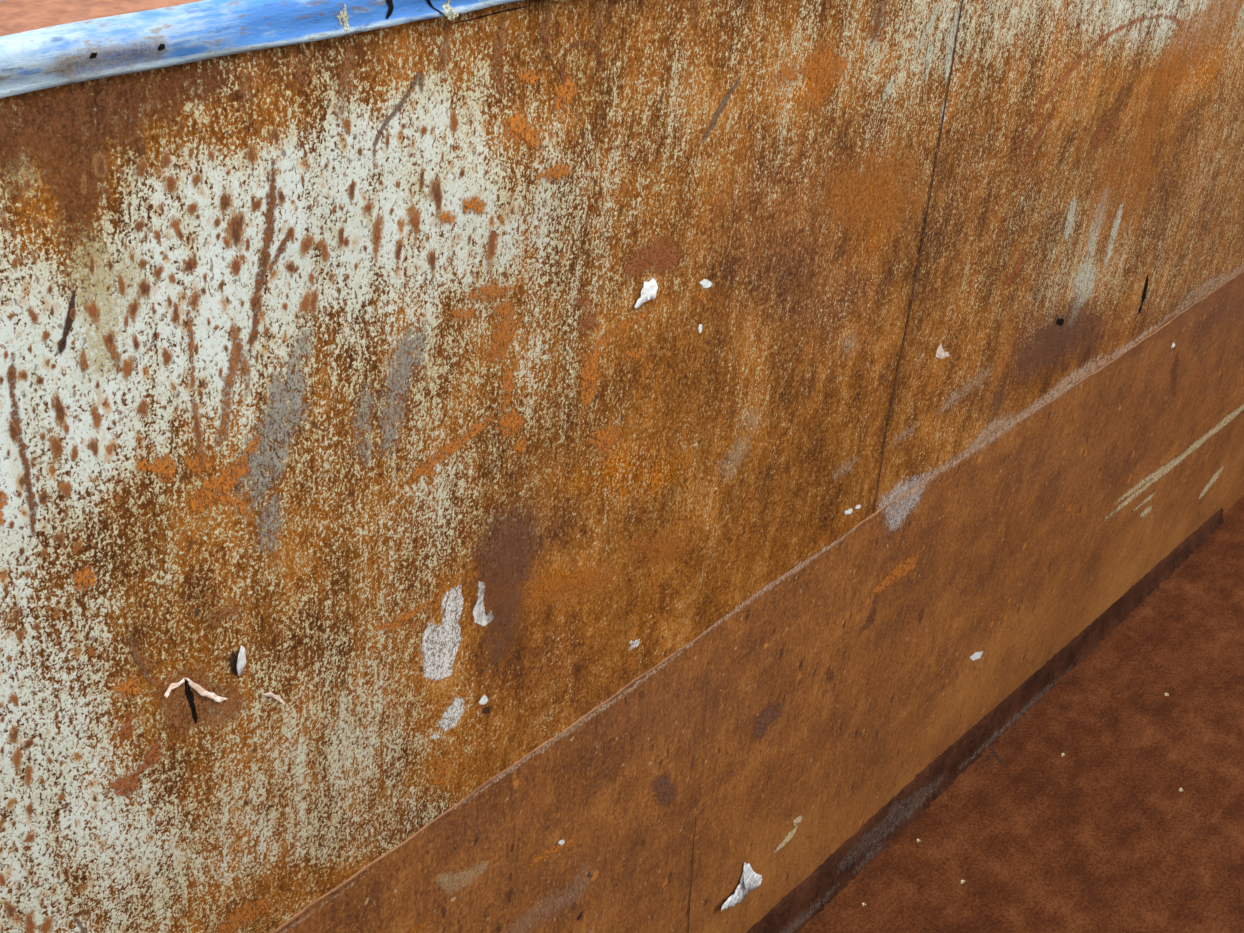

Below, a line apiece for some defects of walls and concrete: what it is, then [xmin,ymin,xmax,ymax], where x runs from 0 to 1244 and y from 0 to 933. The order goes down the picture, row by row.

corrosion [7,354,39,534]
corrosion [58,293,76,354]
spalling [19,360,116,463]
corrosion [135,159,293,521]
spalling [80,150,349,379]
spalling [333,170,468,306]
corrosion [438,196,487,225]
corrosion [404,282,527,484]
peeling [634,278,658,309]
peeling [422,582,494,681]
corrosion [113,640,248,736]
peeling [721,863,762,912]